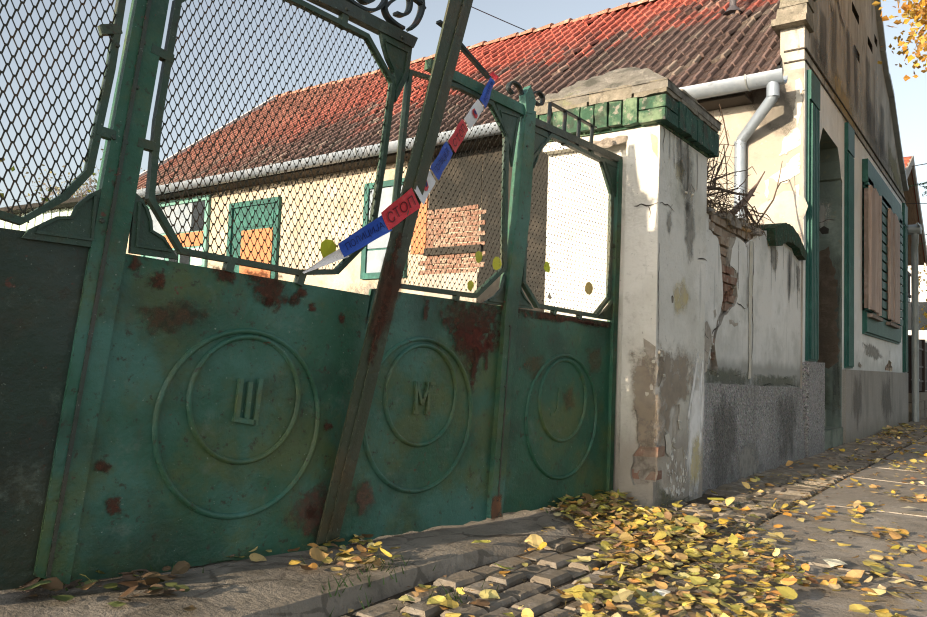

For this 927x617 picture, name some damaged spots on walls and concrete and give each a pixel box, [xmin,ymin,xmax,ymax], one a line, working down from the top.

damp [677,137,695,255]
peeling [765,78,804,203]
corrosion [368,232,403,364]
peeling [641,339,665,396]
flaking render [704,211,753,377]
flaking render [818,247,840,369]
peeling [632,411,687,503]